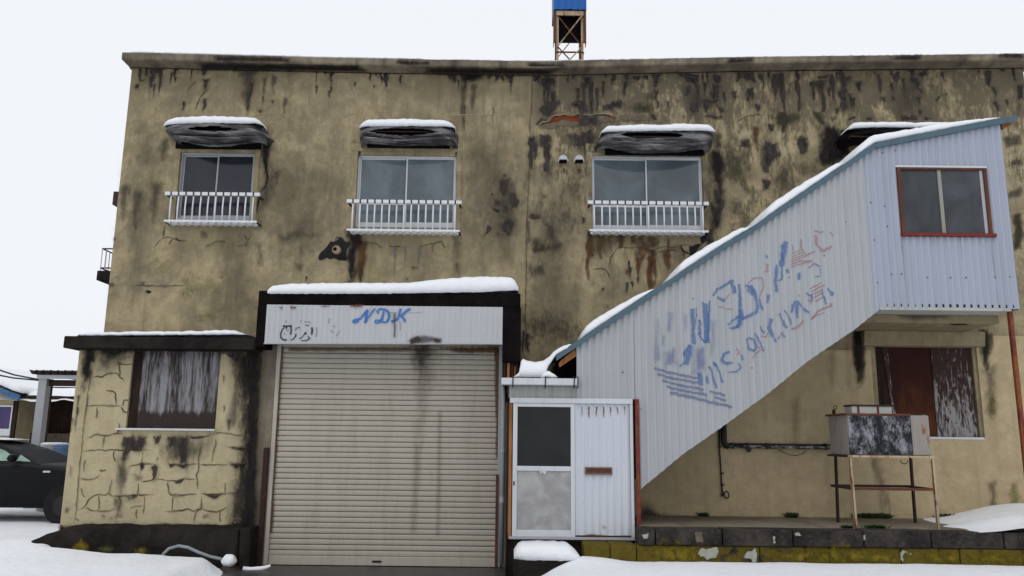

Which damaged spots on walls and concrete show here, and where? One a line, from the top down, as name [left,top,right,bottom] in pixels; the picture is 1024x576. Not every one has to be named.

water stain [191,56,669,120]
flaking render [536,113,653,129]
water stain [527,134,551,171]
water stain [677,58,872,244]
rust [347,234,367,282]
rust [586,233,670,288]
water stain [853,331,865,382]
crack [76,363,245,522]
water stain [120,435,208,483]
water stain [218,352,262,526]
peeling [695,532,719,560]
peeling [744,548,757,563]